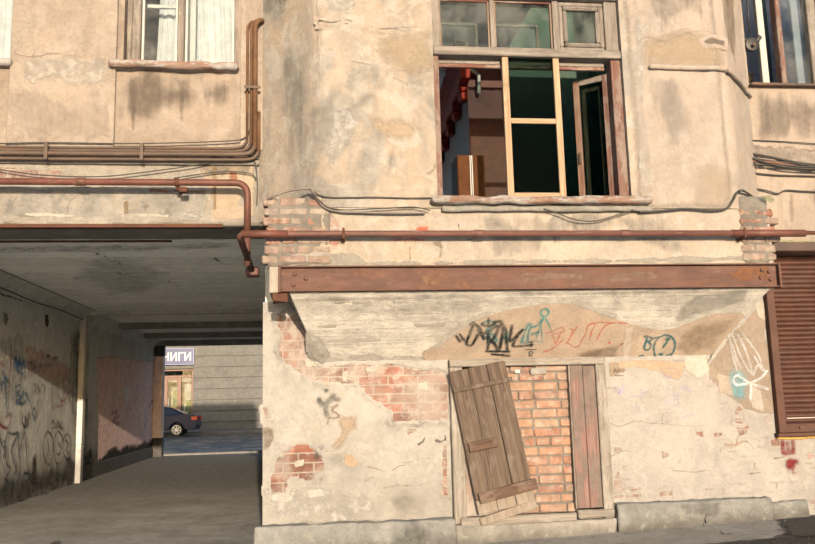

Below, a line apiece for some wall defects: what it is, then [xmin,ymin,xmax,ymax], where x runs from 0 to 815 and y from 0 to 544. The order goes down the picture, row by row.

leakage [129,71,189,114]
leakage [761,100,815,135]
spalling [289,193,421,266]
spalling [435,256,743,265]
peeling [269,301,774,436]
flaking render [259,403,275,425]
flaking render [261,417,358,502]
flaking render [437,440,453,501]